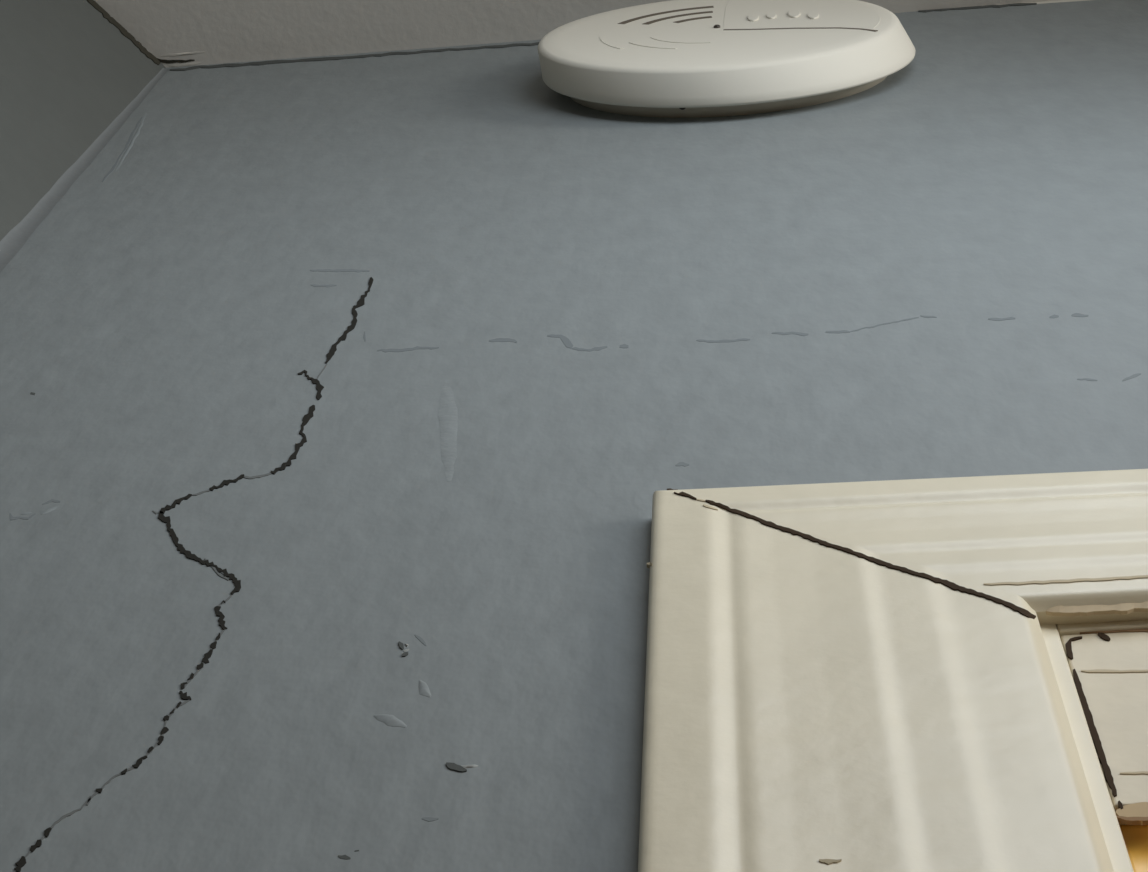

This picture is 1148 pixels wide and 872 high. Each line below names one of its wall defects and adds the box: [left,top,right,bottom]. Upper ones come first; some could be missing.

crack [547,334,629,351]
crack [696,315,937,343]
crack [1049,311,1088,319]
crack [14,269,439,872]